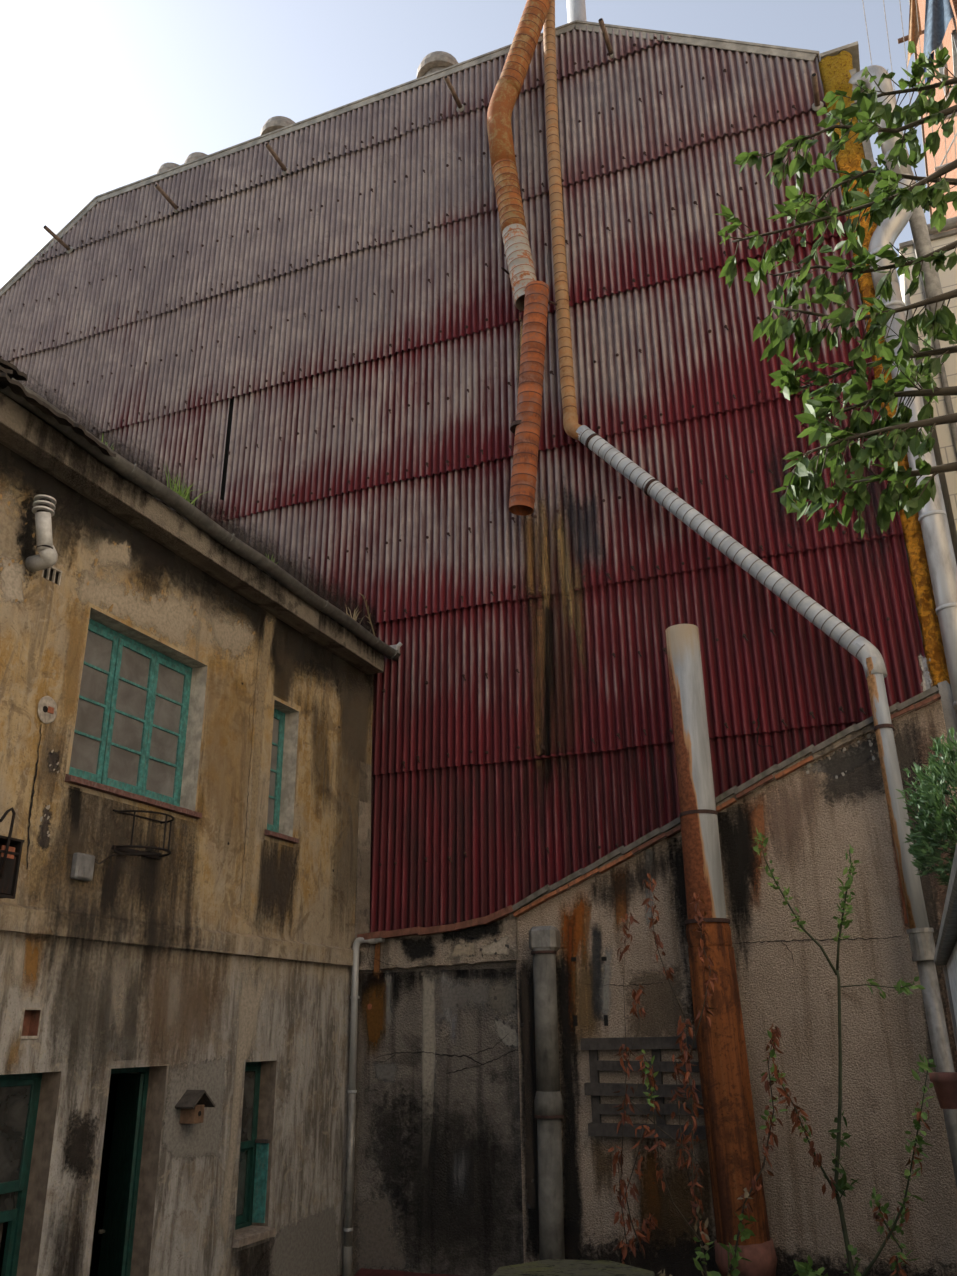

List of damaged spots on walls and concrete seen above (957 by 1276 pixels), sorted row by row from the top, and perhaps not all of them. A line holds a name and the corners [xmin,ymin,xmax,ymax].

rust [492,159,527,232]
rust [749,794,770,903]
leakage [396,919,503,961]
rust [561,893,597,1048]
leakage [64,1111,97,1179]
leakage [217,972,271,1276]
leakage [373,972,521,1272]
leakage [52,1194,85,1276]